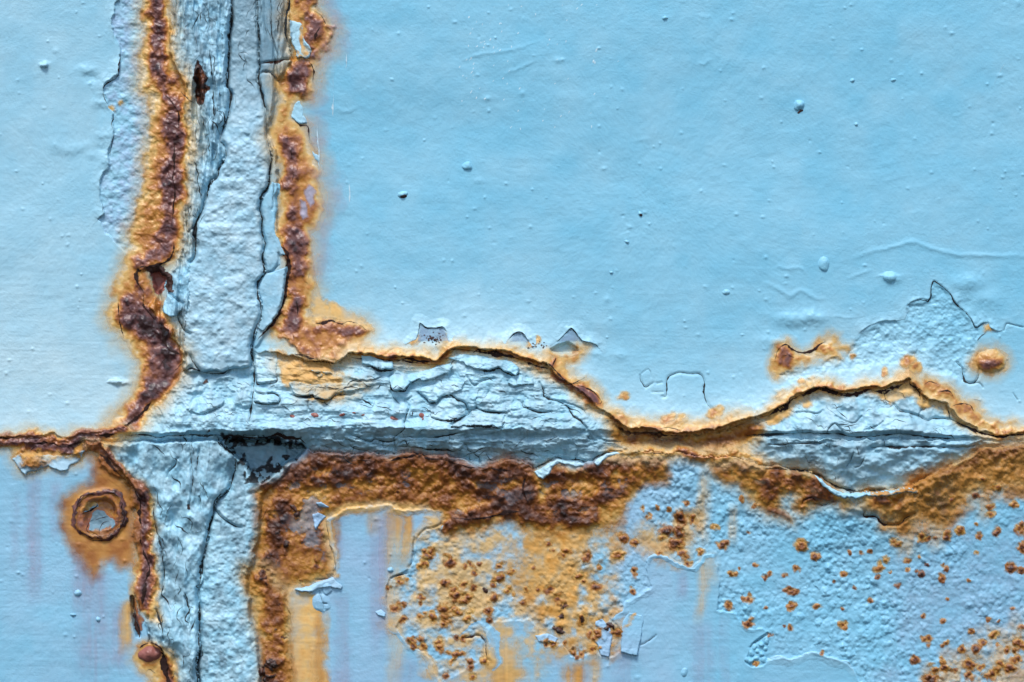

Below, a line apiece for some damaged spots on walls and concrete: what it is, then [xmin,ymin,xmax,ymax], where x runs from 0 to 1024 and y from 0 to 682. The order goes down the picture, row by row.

rust [0,0,195,682]
peeling [189,391,225,415]
peeling [258,182,288,331]
peeling [254,350,534,452]
rust [243,0,1024,682]
crack [640,372,711,408]
peeling [850,265,1016,341]
peeling [535,452,620,479]